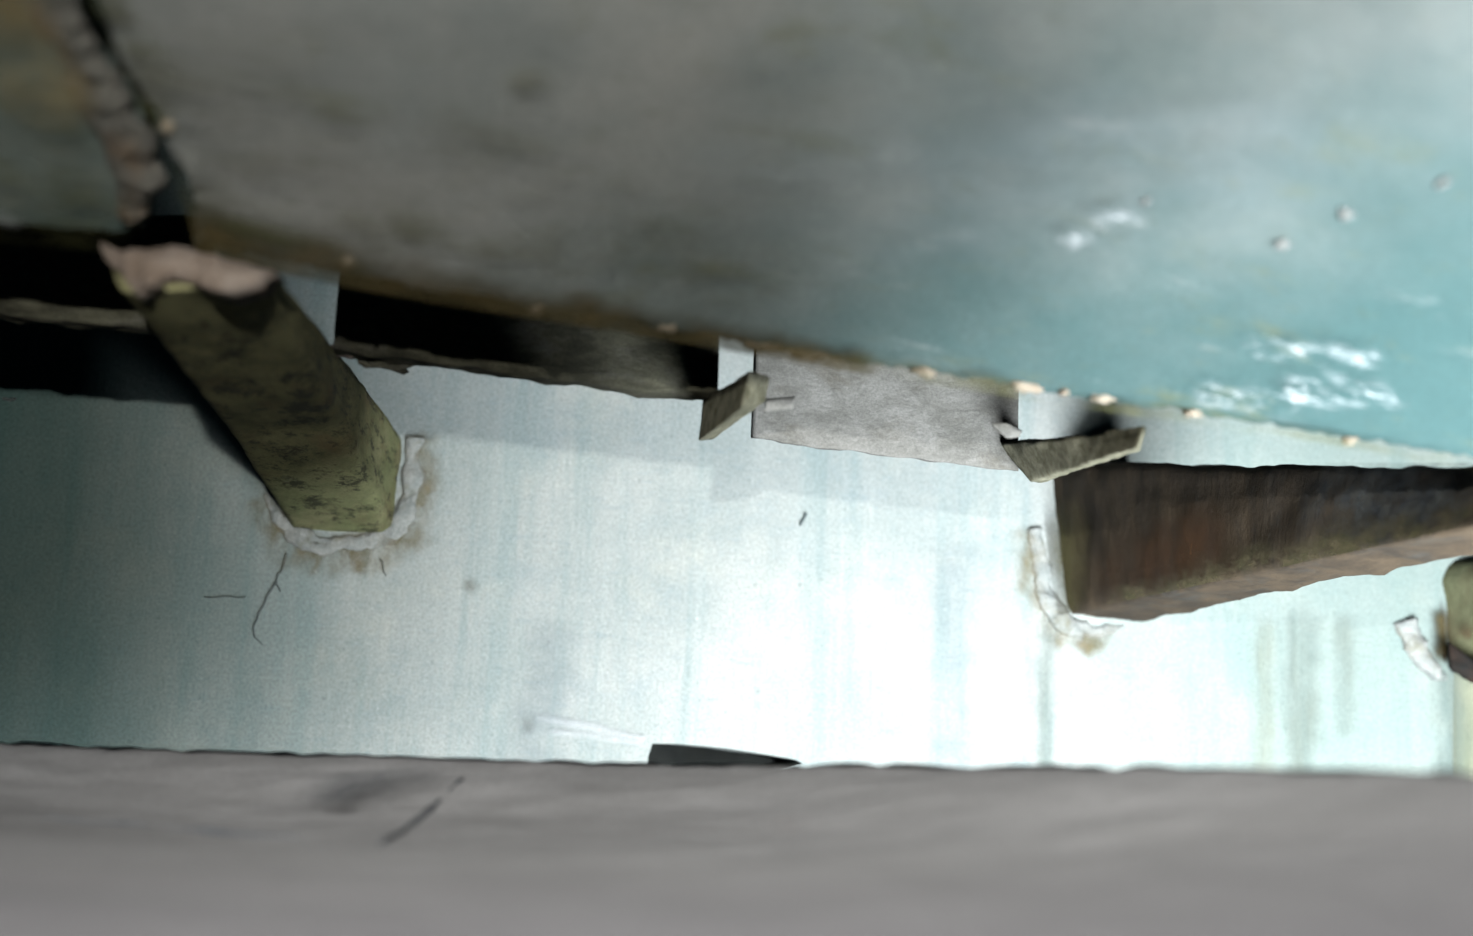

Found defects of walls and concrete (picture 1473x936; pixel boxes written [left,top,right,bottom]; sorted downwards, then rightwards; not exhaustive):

spalling [908,366,939,379]
spalling [1008,380,1070,397]
spalling [1089,395,1119,405]
crack [204,553,288,645]
corrosion [1436,613,1448,661]